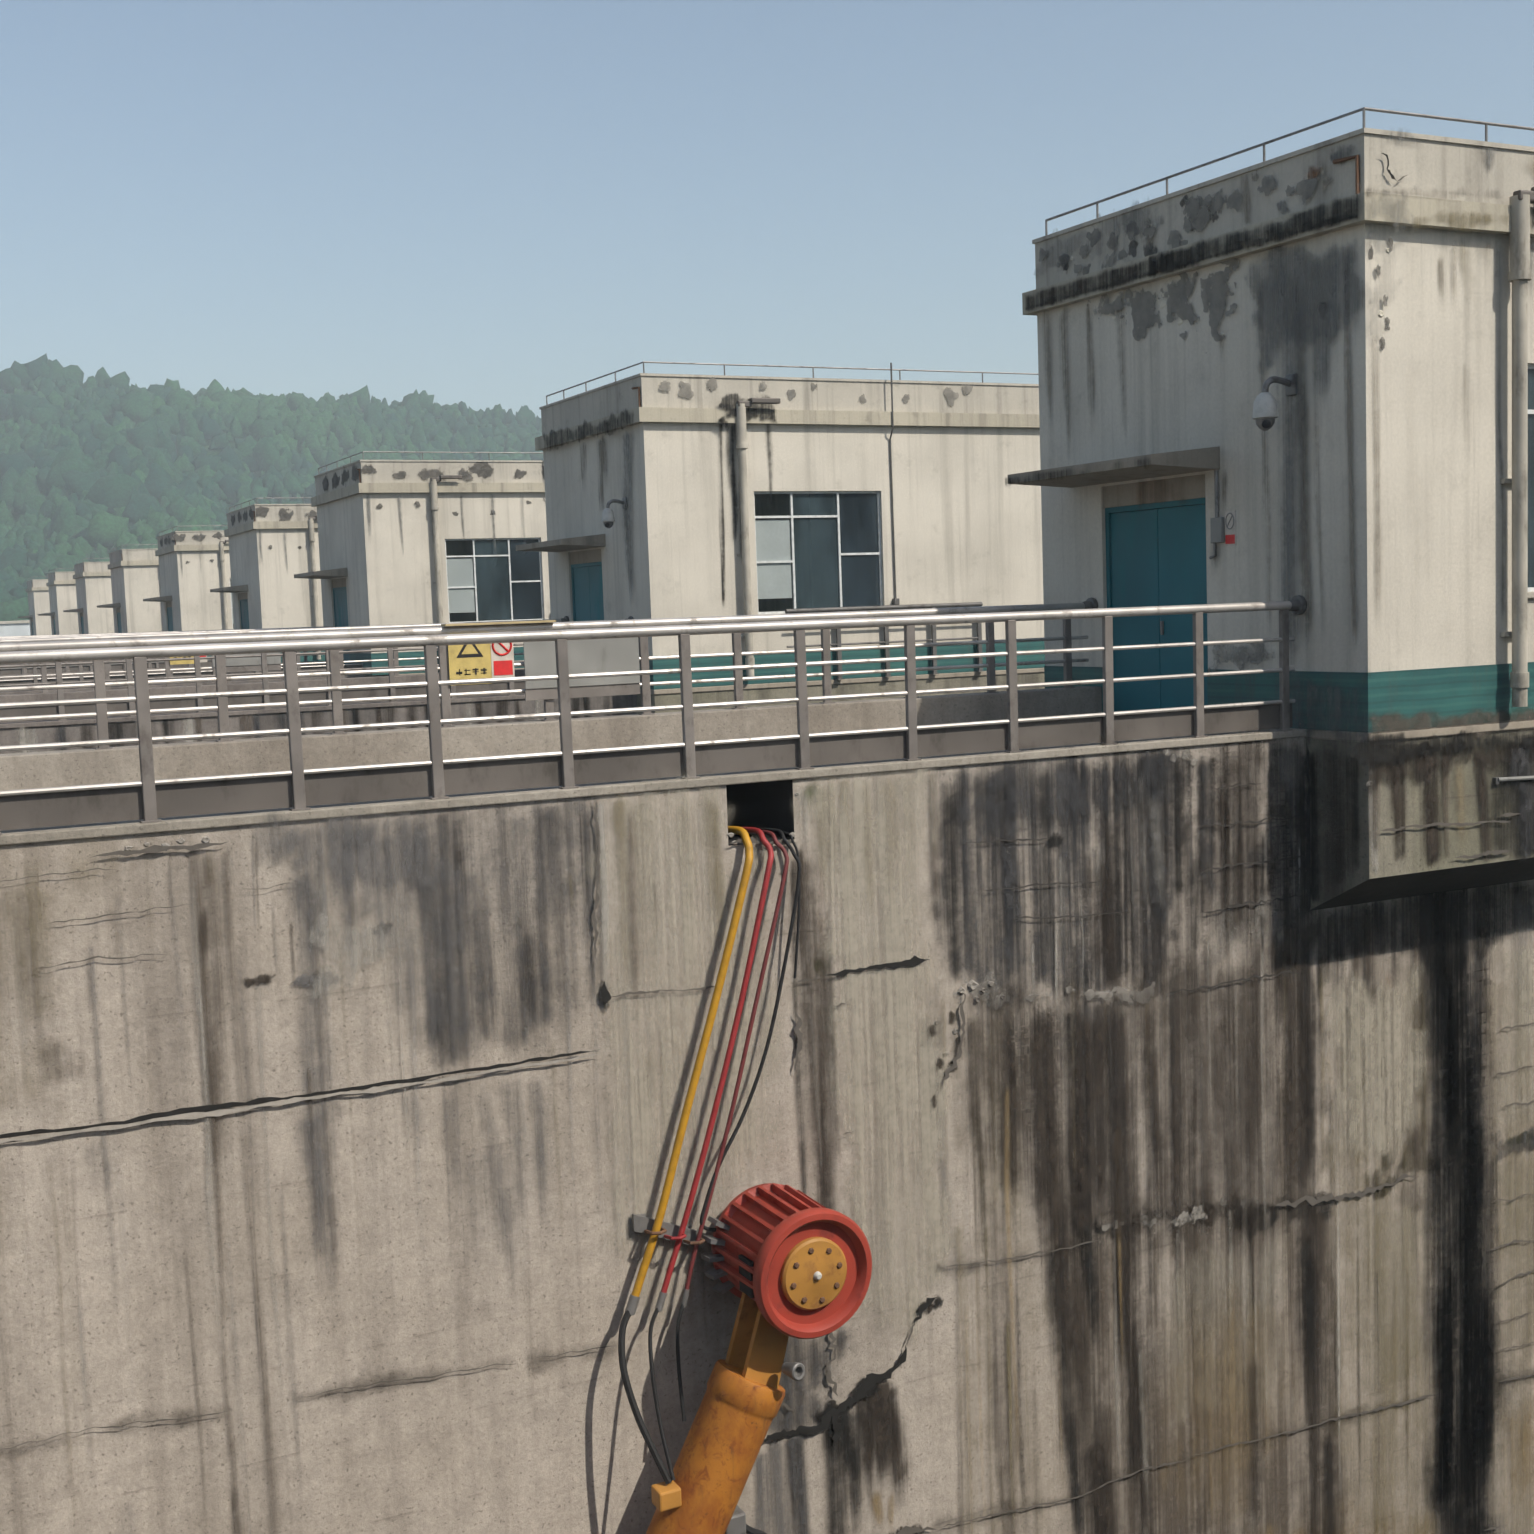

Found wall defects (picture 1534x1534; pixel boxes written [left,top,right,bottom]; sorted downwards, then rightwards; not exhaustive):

peeling [1039,148,1350,276]
peeling [660,377,717,399]
peeling [787,383,817,401]
peeling [944,385,973,406]
damp [720,423,742,601]
damp [1372,709,1534,857]
crack [0,1049,600,1144]
damp [501,795,775,1300]
crack [794,955,930,1074]
damp [792,778,949,1334]
damp [916,751,1534,1534]
crack [764,1239,1106,1446]